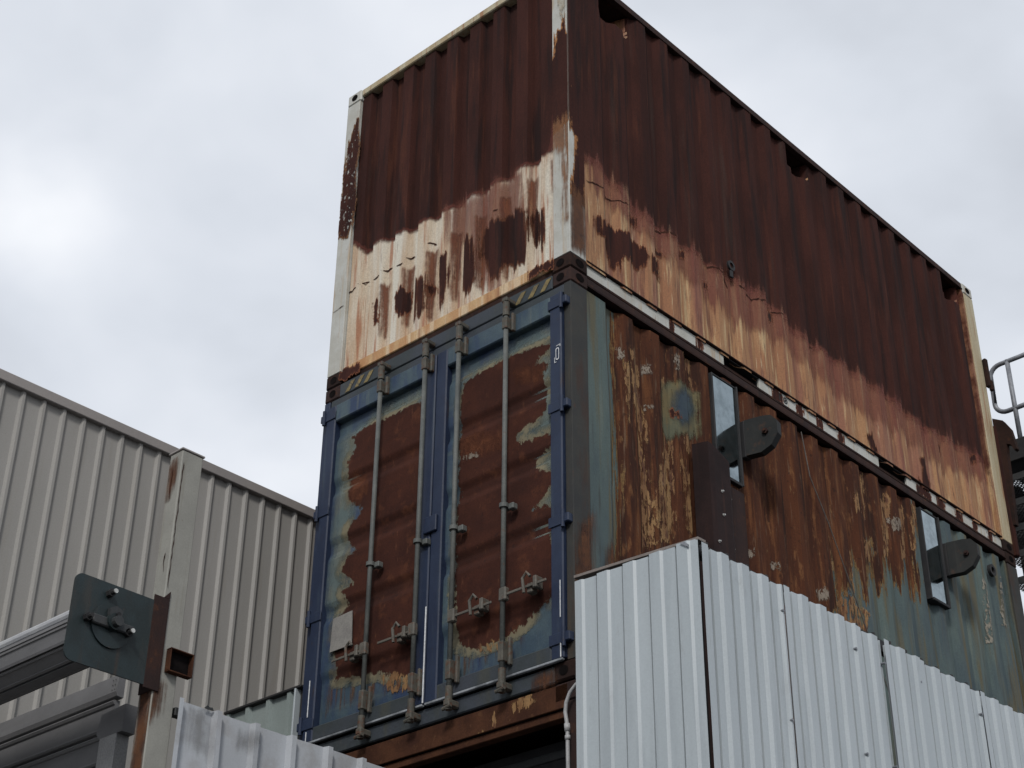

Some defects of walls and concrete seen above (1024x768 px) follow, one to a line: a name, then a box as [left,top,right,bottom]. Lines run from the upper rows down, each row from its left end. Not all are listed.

rust [338,0,993,672]